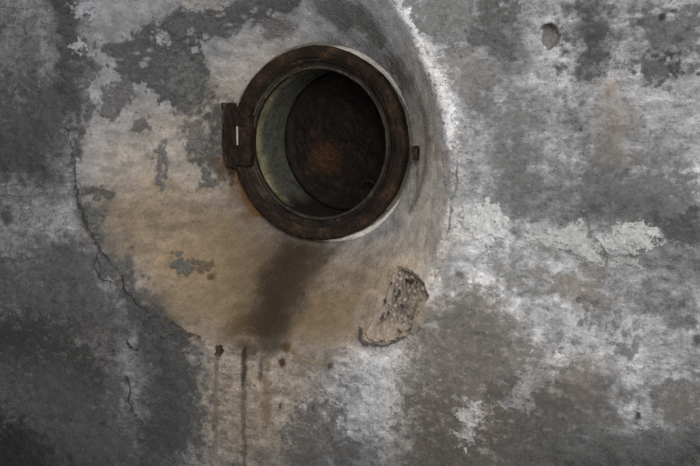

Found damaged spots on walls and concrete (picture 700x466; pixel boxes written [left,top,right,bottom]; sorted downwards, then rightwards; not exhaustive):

spalling [540,22,561,51]
crack [65,126,148,313]
peeling [169,251,216,279]
damp [245,239,334,344]
spalling [358,266,435,348]
damp [0,231,218,466]
crack [126,375,157,438]